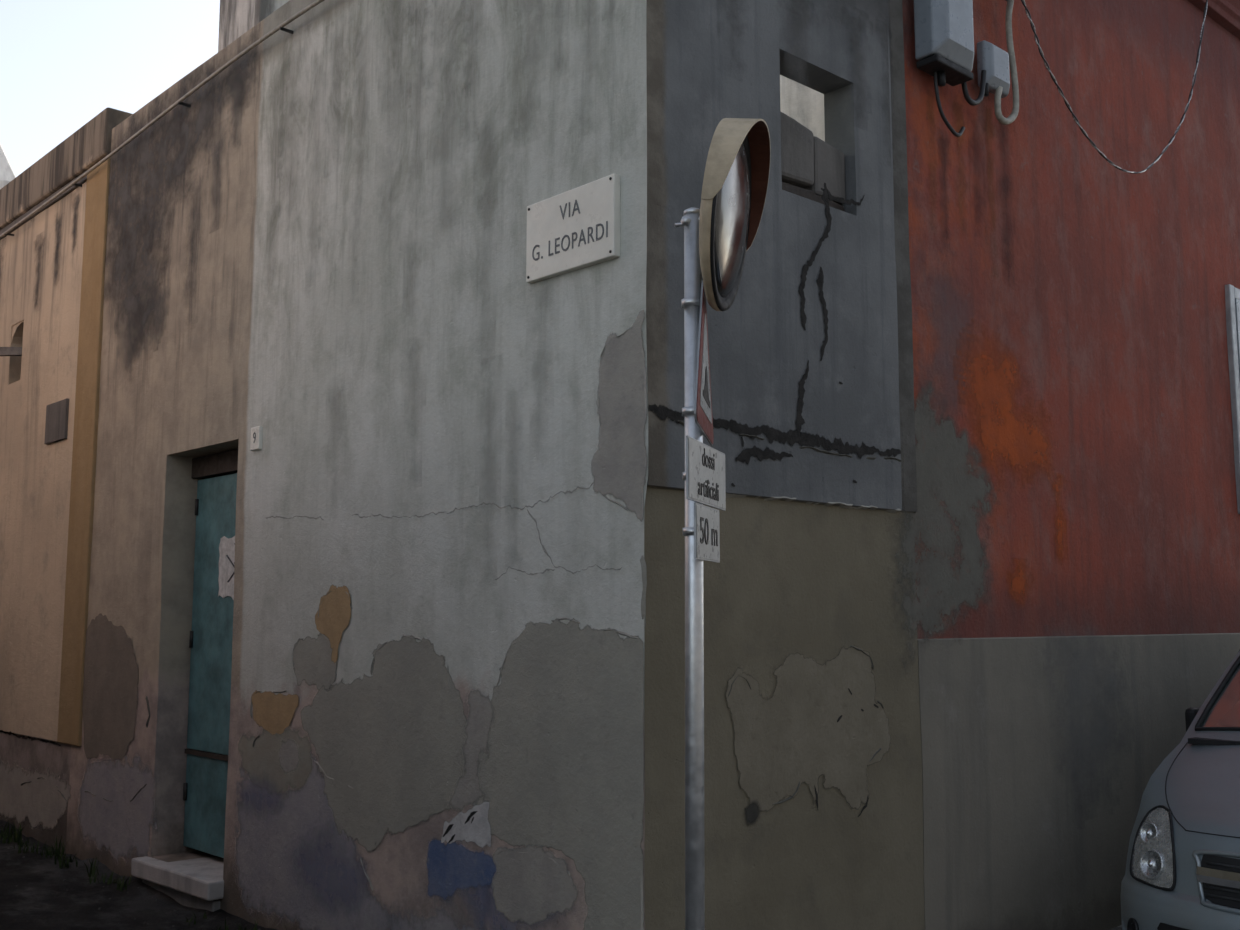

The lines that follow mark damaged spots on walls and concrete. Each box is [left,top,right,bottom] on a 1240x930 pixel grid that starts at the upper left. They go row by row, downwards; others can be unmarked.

damp [105,49,256,364]
crack [649,183,901,464]
peeling [591,310,647,521]
crack [268,482,621,580]
peeling [315,585,353,663]
peeling [250,690,299,747]
flaking render [441,801,577,925]